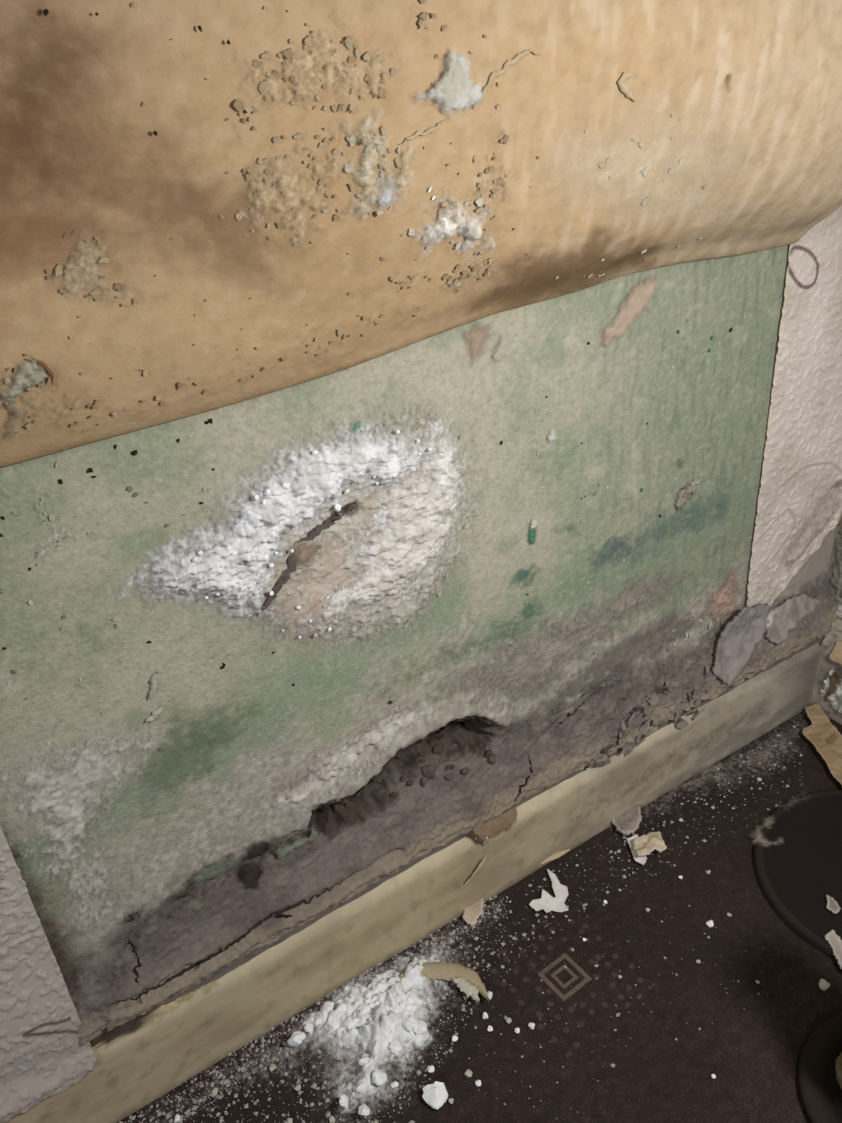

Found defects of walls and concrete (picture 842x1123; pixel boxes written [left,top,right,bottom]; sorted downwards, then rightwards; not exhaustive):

peeling [254,30,358,112]
flaking render [273,49,542,215]
peeling [428,156,508,231]
peeling [602,278,657,347]
flaking render [2,354,54,437]
leakage [123,407,479,649]
leakage [440,572,696,738]
leakage [0,720,230,938]
leakage [264,700,434,816]
flaking render [68,519,842,1045]
crack [112,881,343,1005]
leakage [98,1012,150,1044]